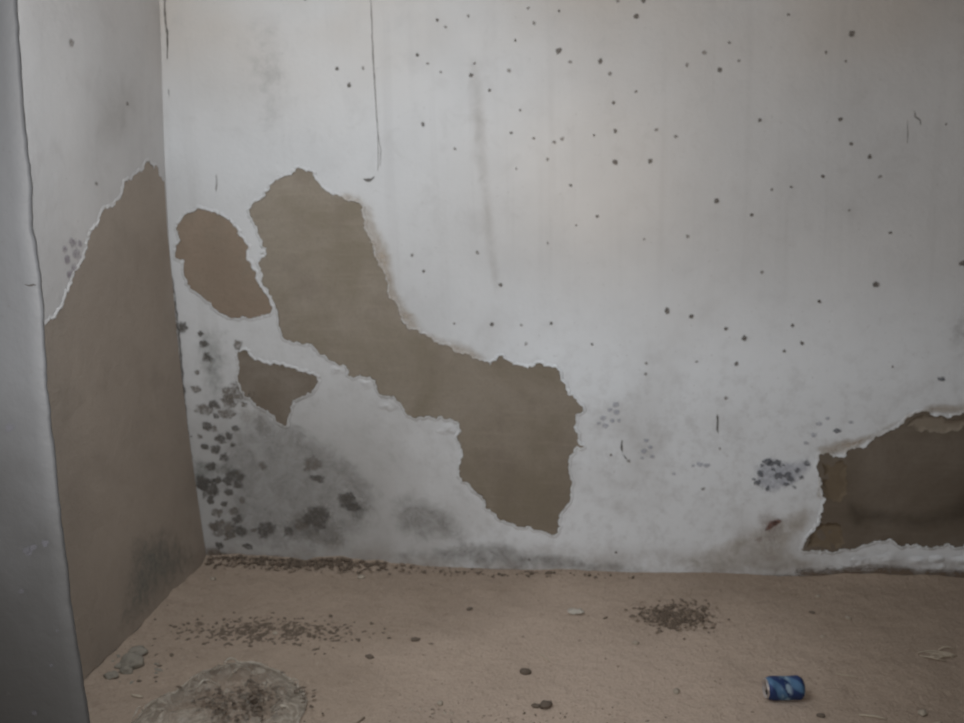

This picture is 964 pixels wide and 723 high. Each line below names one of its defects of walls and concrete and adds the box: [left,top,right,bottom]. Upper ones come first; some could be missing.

crack [364,0,381,182]
flaking render [44,157,587,678]
leakage [753,459,810,491]
flaking render [799,408,964,555]